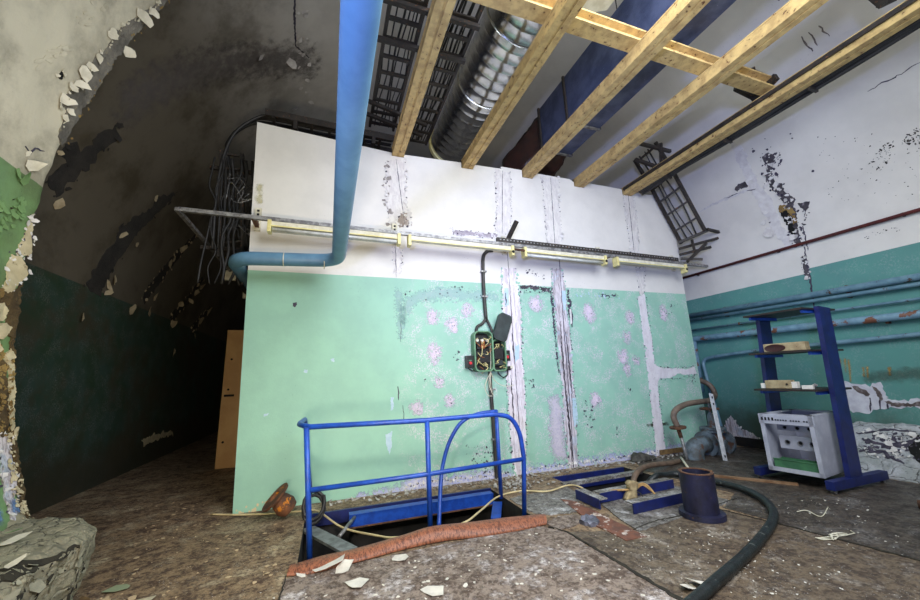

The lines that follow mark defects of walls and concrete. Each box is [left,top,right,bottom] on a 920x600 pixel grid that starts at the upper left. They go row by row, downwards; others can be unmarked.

flaking render [16,0,170,209]
peeling [84,192,177,297]
flaking render [748,148,814,307]
peeling [0,196,40,522]
peeling [395,252,620,476]
peeling [844,381,920,414]
flaking render [908,434,920,463]
peeling [0,531,32,546]
peeling [2,541,87,600]